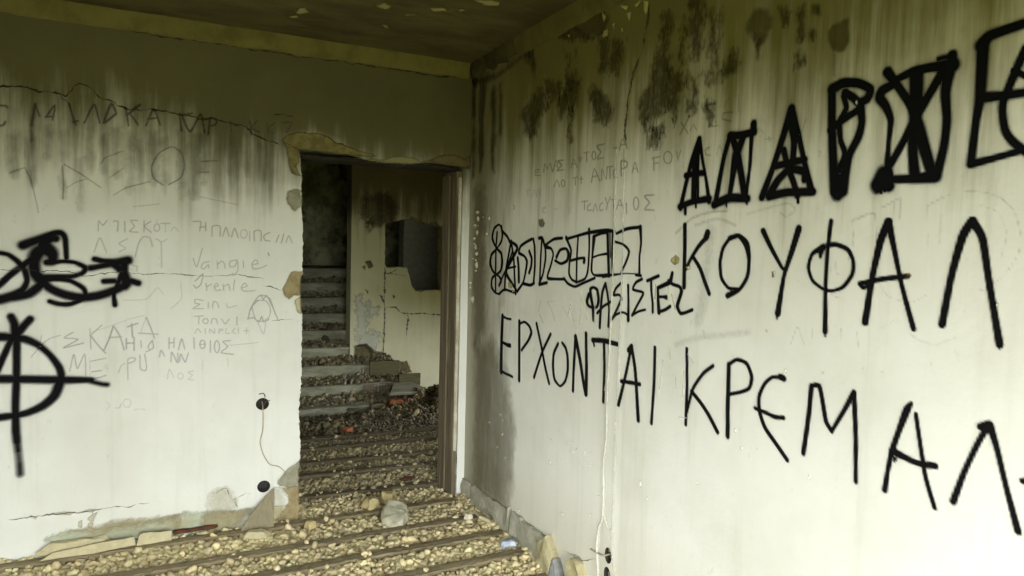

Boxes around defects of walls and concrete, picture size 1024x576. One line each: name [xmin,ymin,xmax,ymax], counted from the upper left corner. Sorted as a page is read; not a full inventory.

crack [0,83,351,168]
flaking render [283,133,471,176]
water stain [472,66,509,177]
water stain [523,54,612,143]
water stain [559,12,624,76]
water stain [638,0,737,148]
water stain [747,5,820,66]
water stain [828,20,849,51]
flaking render [283,271,302,313]
peeling [354,290,383,360]
flaking render [399,361,412,374]